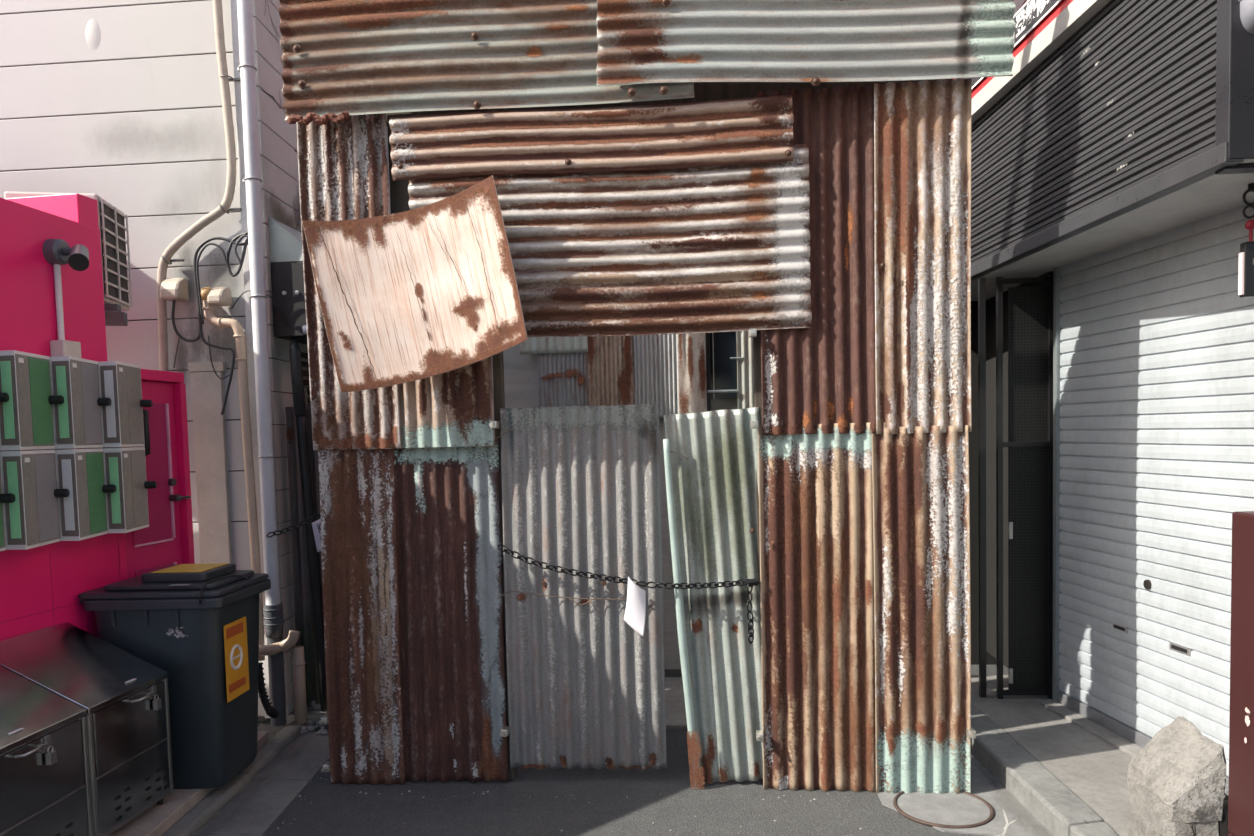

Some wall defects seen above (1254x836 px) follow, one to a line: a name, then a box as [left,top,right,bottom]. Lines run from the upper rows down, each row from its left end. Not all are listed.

rust [278,0,448,115]
rust [391,71,461,85]
rust [526,46,542,57]
rust [546,0,701,84]
rust [298,96,804,779]
rust [754,85,965,790]
rust [687,731,728,790]